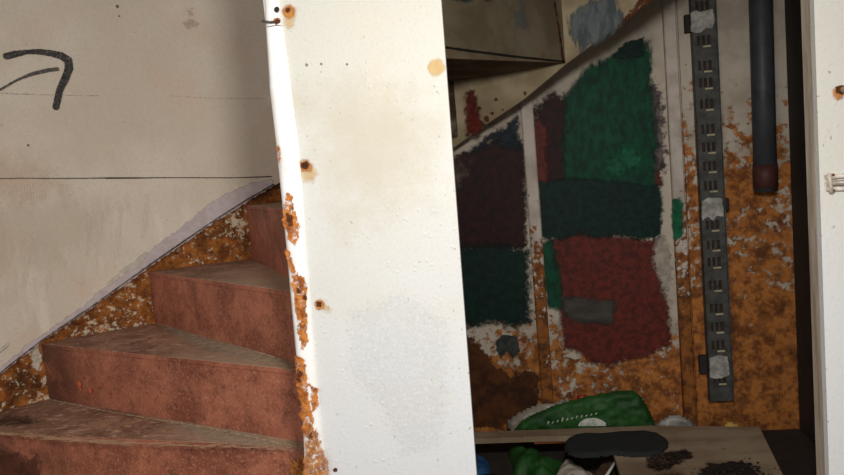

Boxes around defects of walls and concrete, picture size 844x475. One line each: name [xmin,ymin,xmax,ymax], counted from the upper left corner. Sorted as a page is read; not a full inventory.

corrosion [274,5,295,27]
corrosion [833,85,844,100]
corrosion [300,160,315,180]
corrosion [282,193,337,475]
corrosion [467,337,541,430]